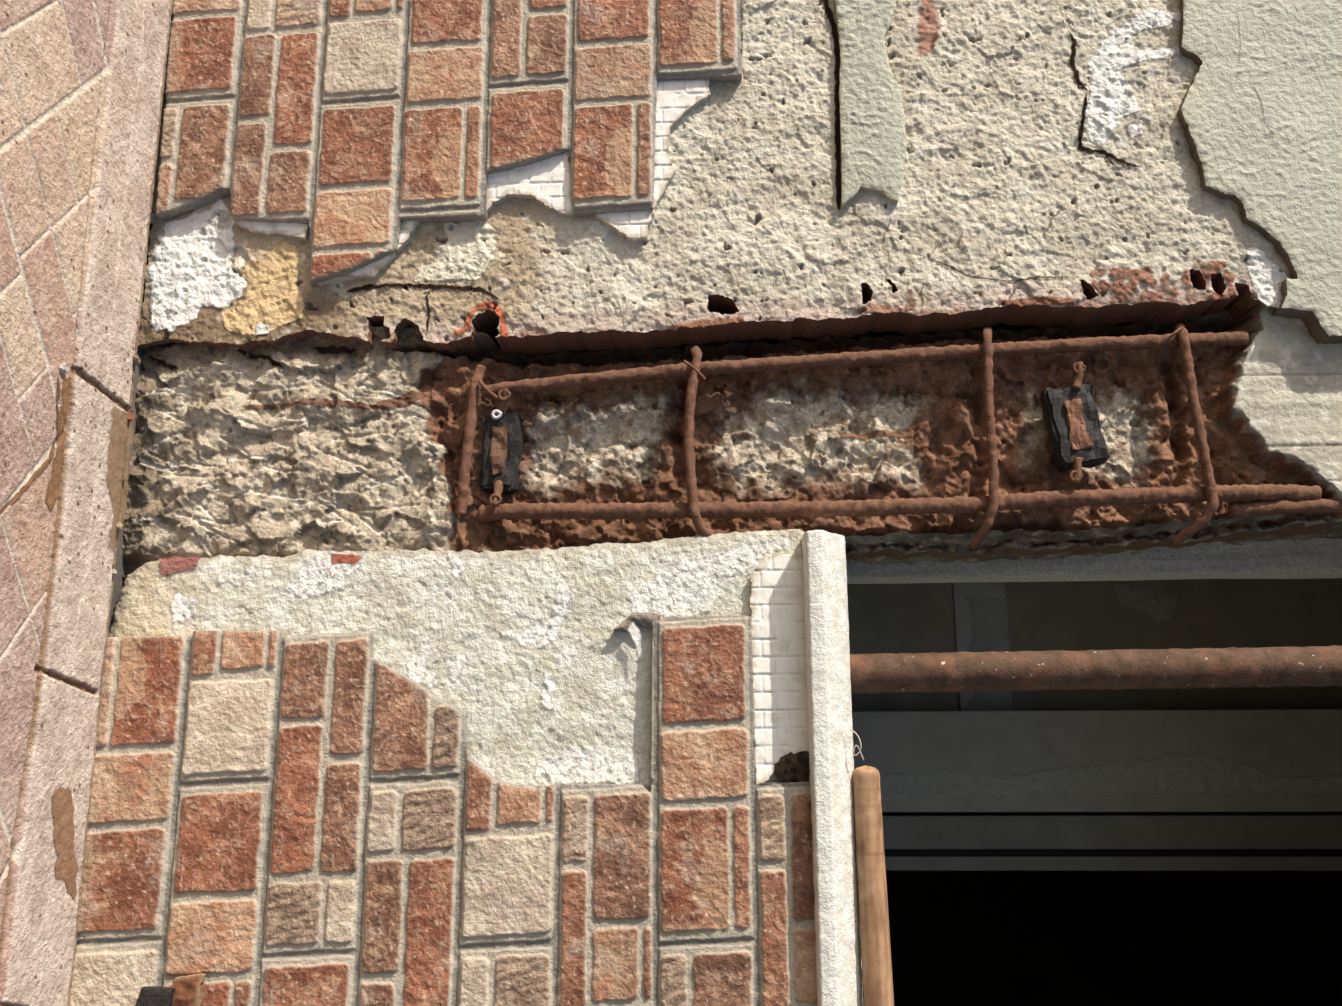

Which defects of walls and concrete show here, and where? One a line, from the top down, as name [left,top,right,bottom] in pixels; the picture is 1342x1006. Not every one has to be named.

crack [823,0,841,210]
peeling [834,0,907,209]
crack [1068,31,1140,172]
peeling [1085,8,1181,144]
crack [148,342,184,370]
crack [235,349,284,368]
spalling [122,198,497,603]
crack [314,345,357,354]
corrosion [244,316,1342,553]
spalling [453,247,1342,560]
peeling [626,536,790,656]
peeling [534,743,644,786]